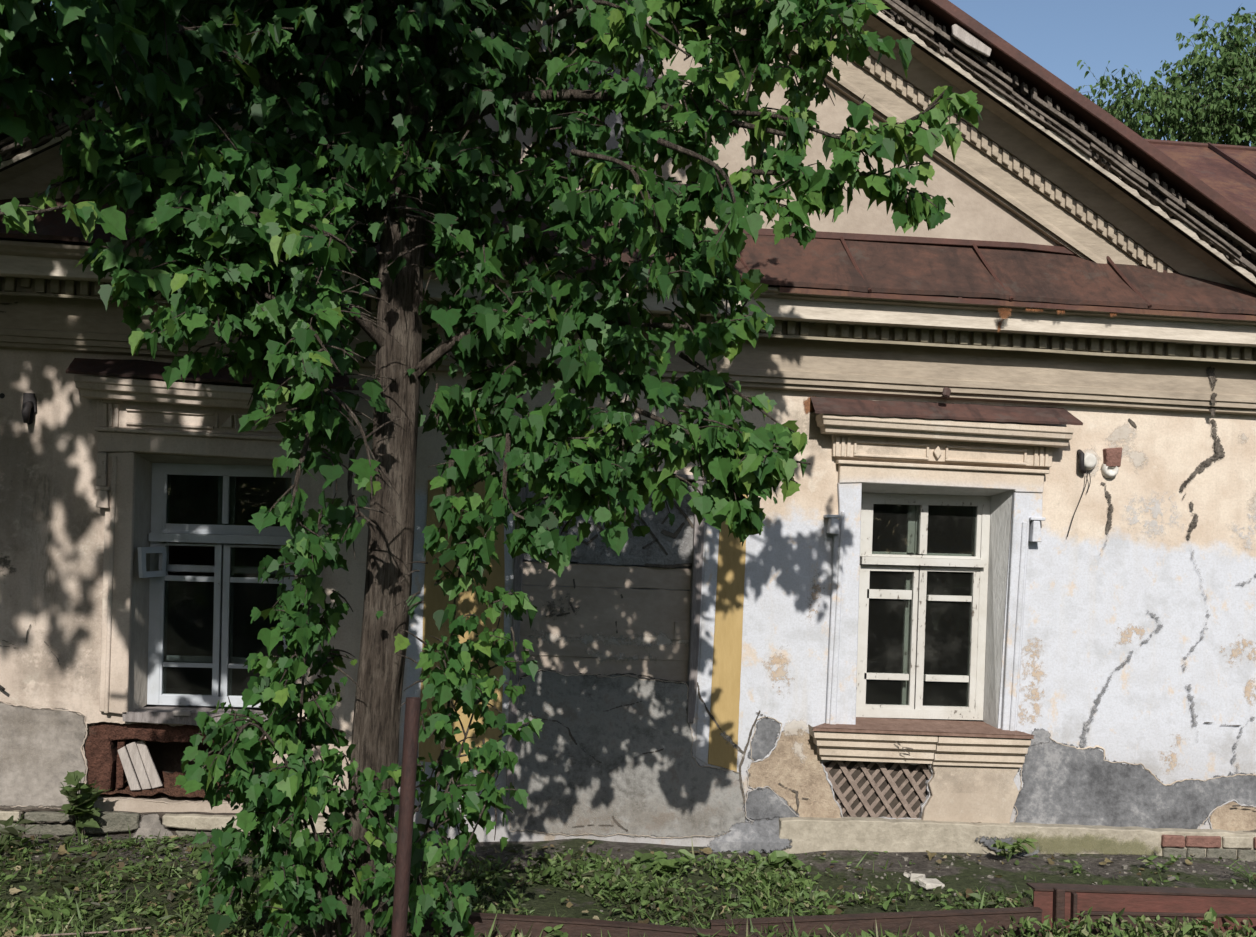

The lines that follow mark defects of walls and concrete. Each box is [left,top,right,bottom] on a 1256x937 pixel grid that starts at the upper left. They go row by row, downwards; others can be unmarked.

crack [1101,482,1114,548]
crack [1180,366,1255,771]
peeling [530,631,689,661]
crack [1080,611,1163,747]
spalling [746,719,933,819]
crack [1232,805,1256,832]